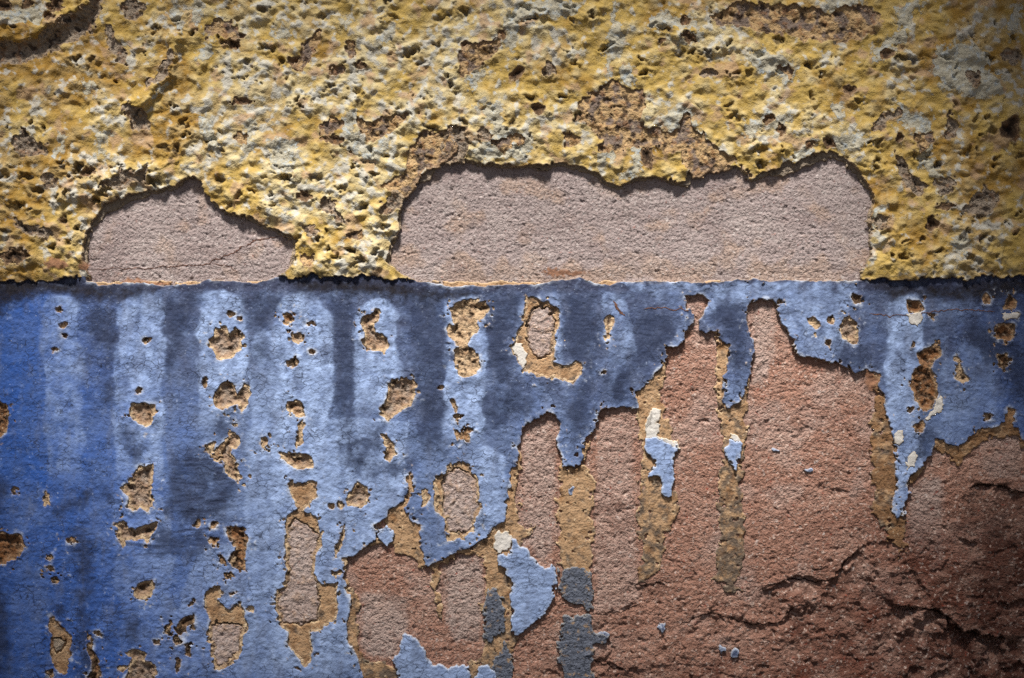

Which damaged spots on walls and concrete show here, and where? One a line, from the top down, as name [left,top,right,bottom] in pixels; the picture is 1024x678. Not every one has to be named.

flaking render [80,130,320,286]
peeling [208,311,248,360]
flaking render [254,0,1024,678]
peeling [110,464,163,548]
leakage [157,454,233,554]
peeling [199,377,252,490]
leakage [347,433,380,464]
crack [969,483,1024,494]
peeling [45,518,254,678]
crack [595,581,665,615]
crack [679,547,862,626]
crack [911,605,1024,641]